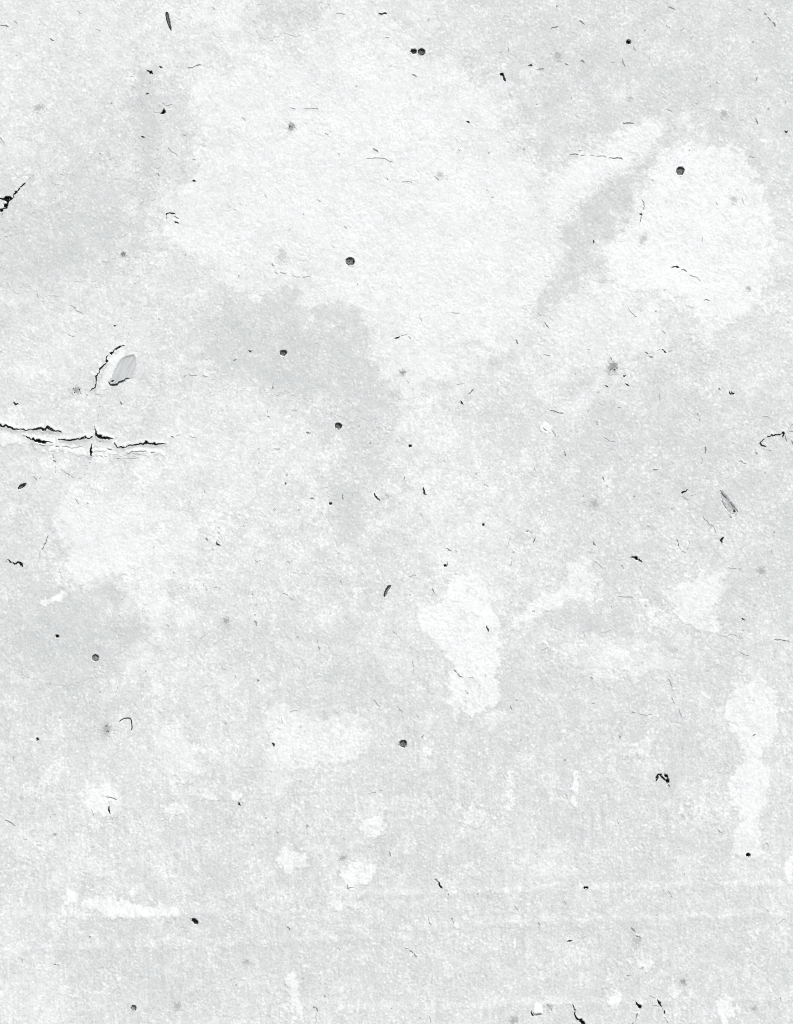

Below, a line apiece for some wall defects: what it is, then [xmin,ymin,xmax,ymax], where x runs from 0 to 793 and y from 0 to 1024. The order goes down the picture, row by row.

crack [0,177,31,239]
spalling [109,354,136,386]
crack [0,325,196,504]